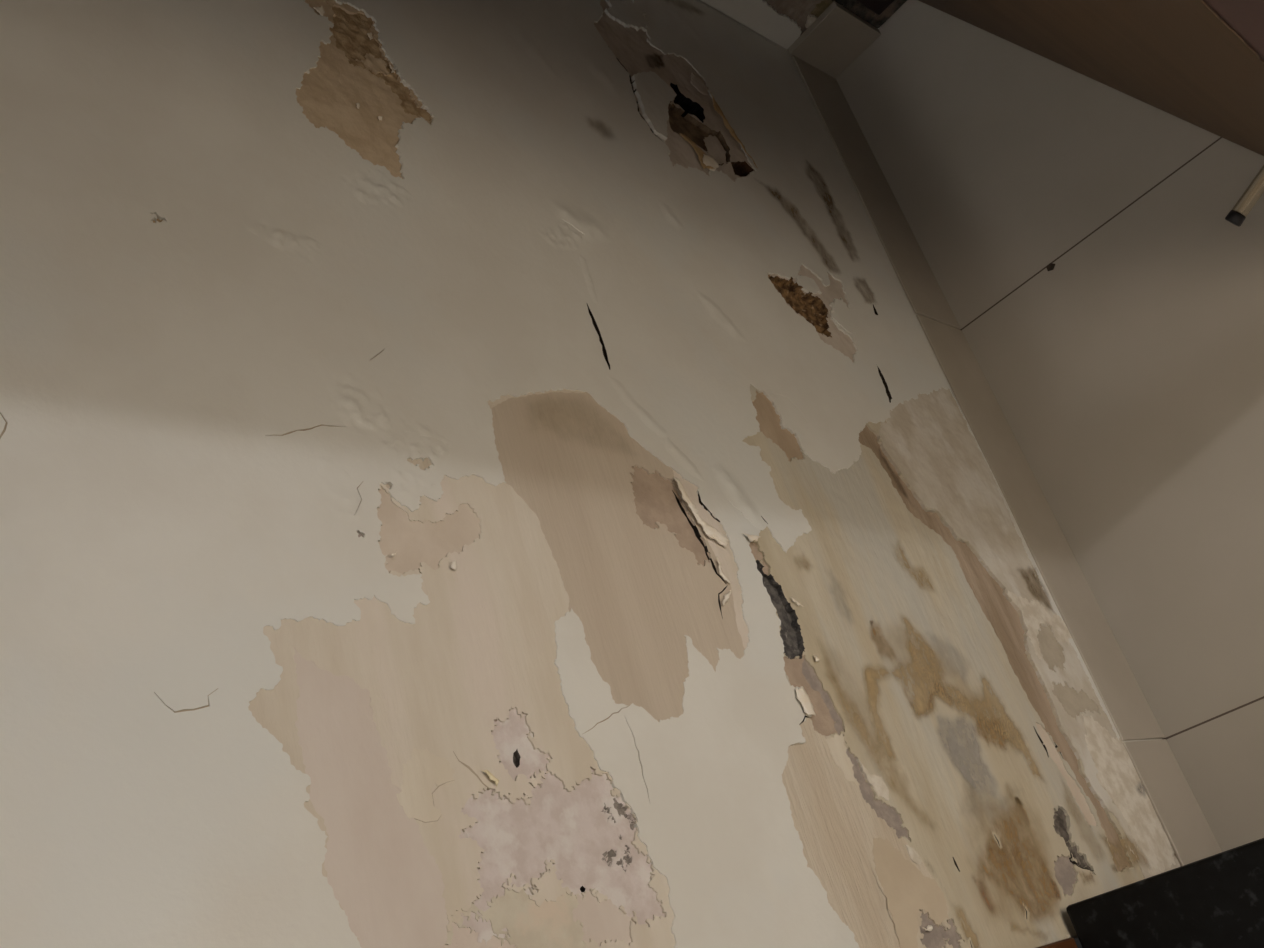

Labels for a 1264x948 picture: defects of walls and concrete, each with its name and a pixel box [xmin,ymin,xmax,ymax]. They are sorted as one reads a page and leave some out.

flaking render [296,0,433,179]
flaking render [594,0,758,182]
flaking render [766,0,878,36]
crack [587,304,610,370]
flaking render [767,265,858,362]
crack [169,689,217,713]
peeling [248,389,749,948]
peeling [742,533,961,948]
leakage [743,384,1181,948]
flaking render [858,425,1131,872]
spalling [1053,808,1094,896]